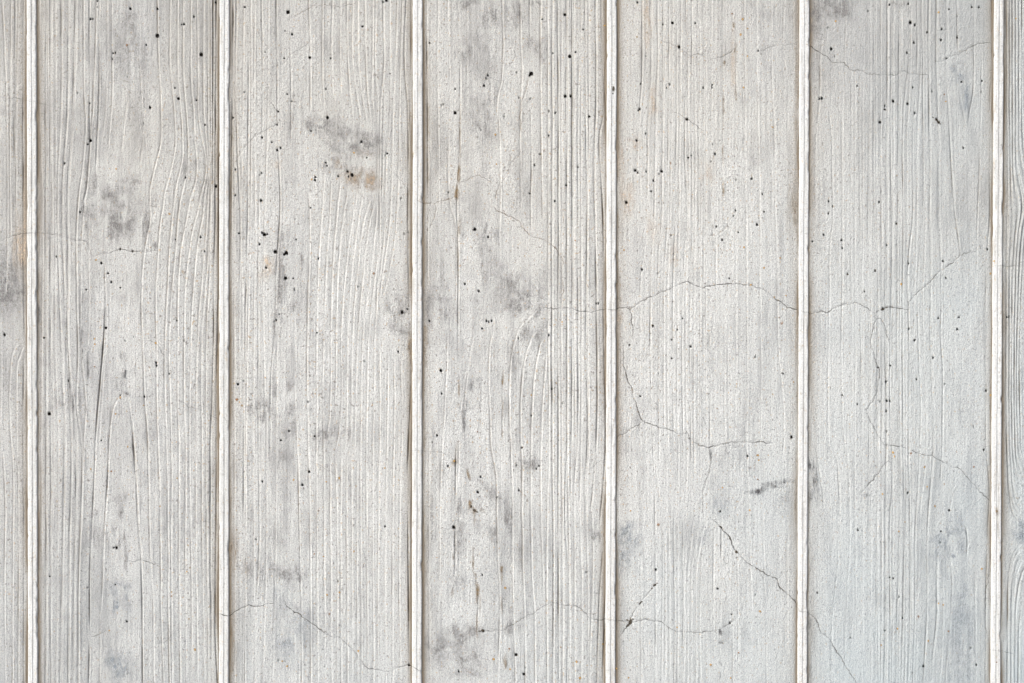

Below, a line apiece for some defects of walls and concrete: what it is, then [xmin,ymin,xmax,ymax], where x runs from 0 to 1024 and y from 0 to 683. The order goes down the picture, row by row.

crack [702,509,796,603]